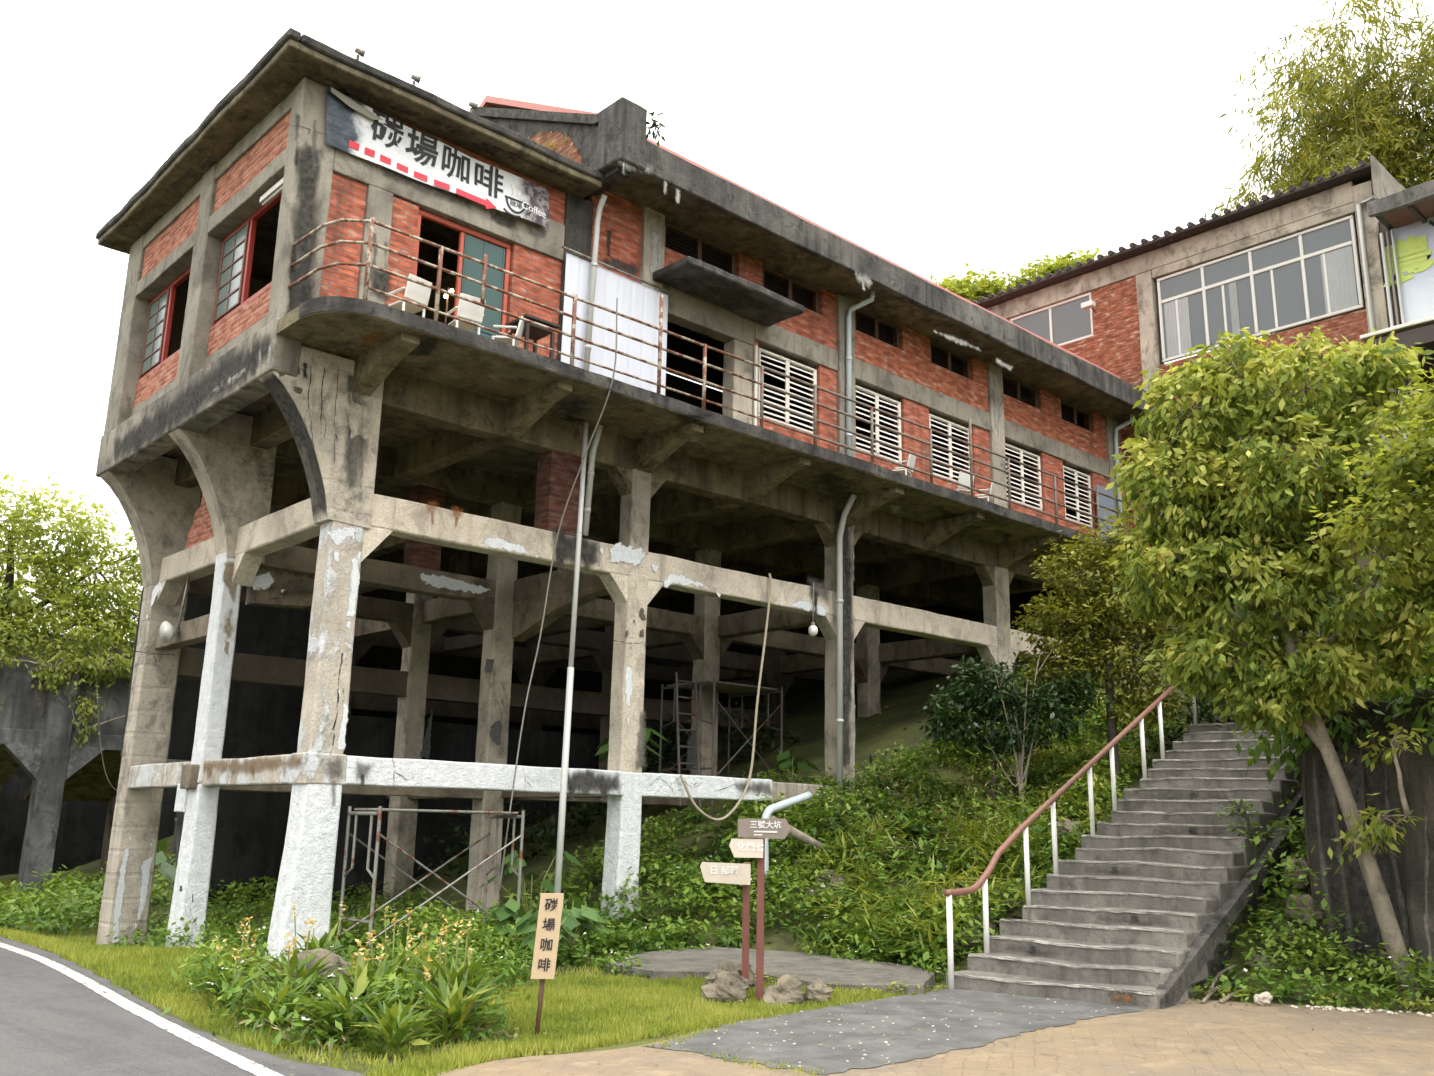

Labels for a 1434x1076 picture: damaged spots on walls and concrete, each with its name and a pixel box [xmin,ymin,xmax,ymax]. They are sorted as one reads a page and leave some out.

leakage [288,114,321,313]
peeling [327,526,361,629]
peeling [420,573,490,594]
peeling [483,537,538,558]
peeling [600,543,721,597]
peeling [337,690,348,750]
leakage [329,760,369,805]